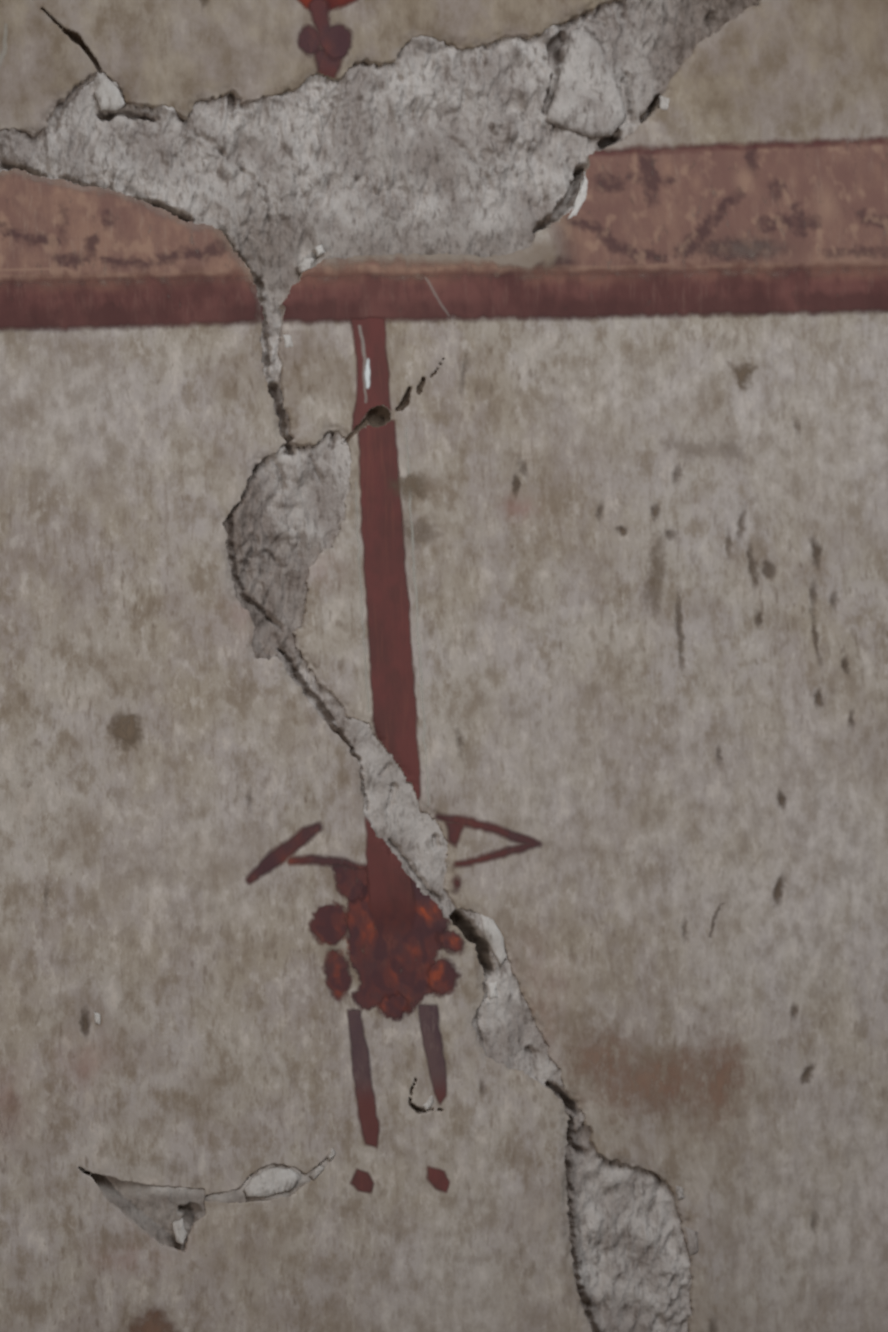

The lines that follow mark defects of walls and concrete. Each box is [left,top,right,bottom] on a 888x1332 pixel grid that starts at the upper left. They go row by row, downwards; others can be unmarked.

crack [40,7,103,73]
flaking render [0,0,759,660]
spalling [748,552,773,583]
spalling [84,1148,335,1250]
spalling [564,1119,698,1332]